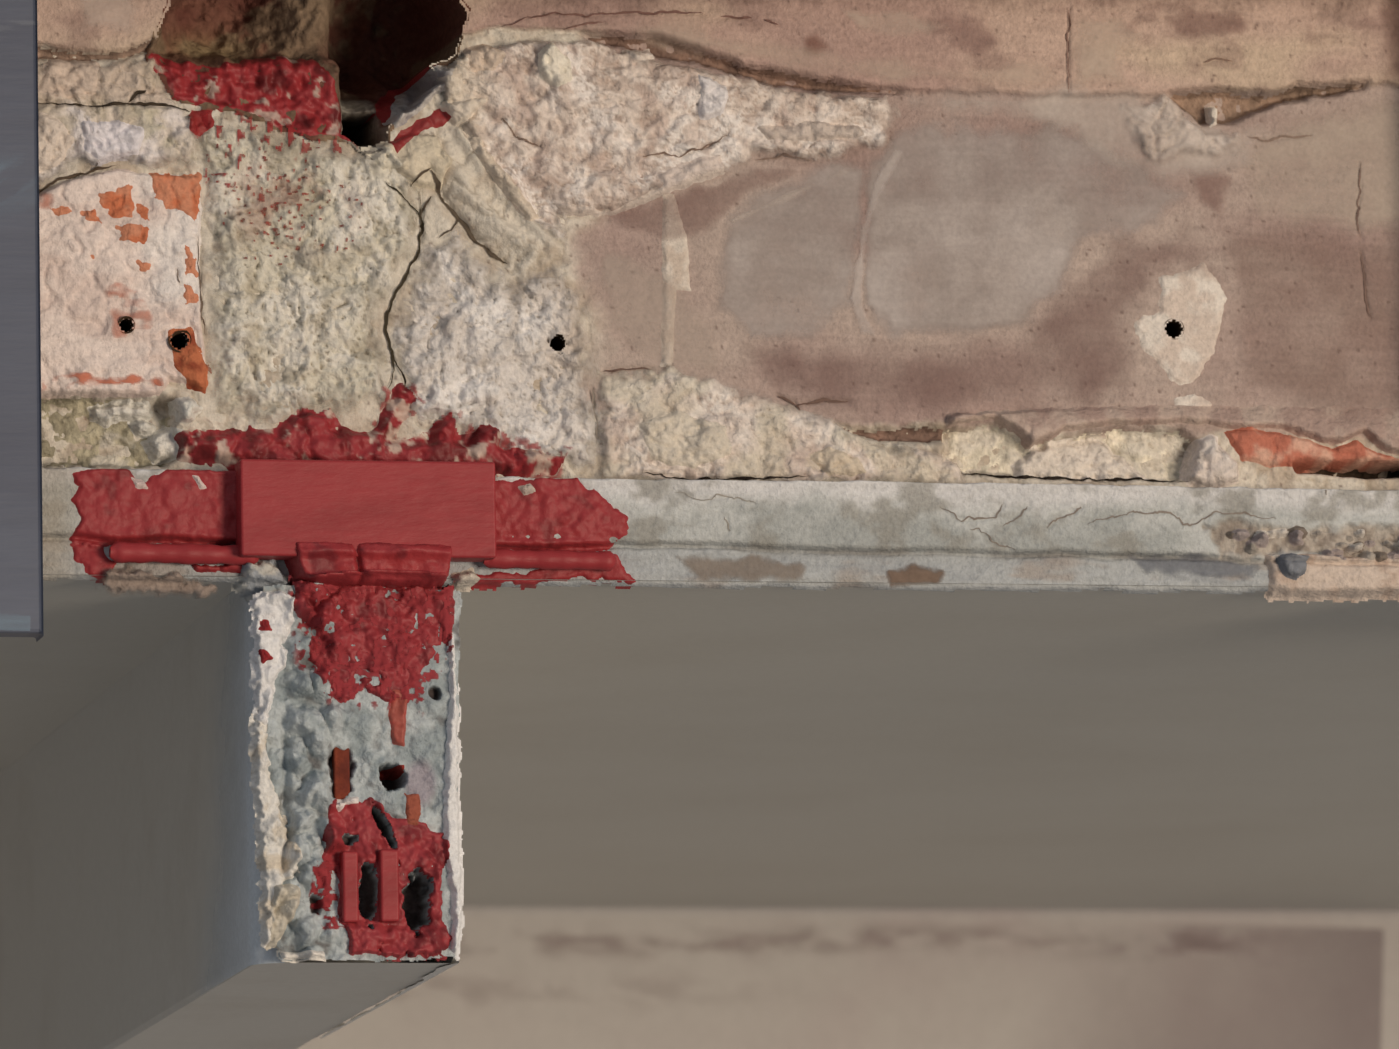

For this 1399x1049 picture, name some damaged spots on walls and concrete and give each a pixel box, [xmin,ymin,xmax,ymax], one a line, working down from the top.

crack [502,10,778,30]
crack [384,168,507,388]
spalling [38,0,1399,489]
crack [1356,166,1372,319]
peeling [518,483,536,495]
spalling [248,583,465,1038]